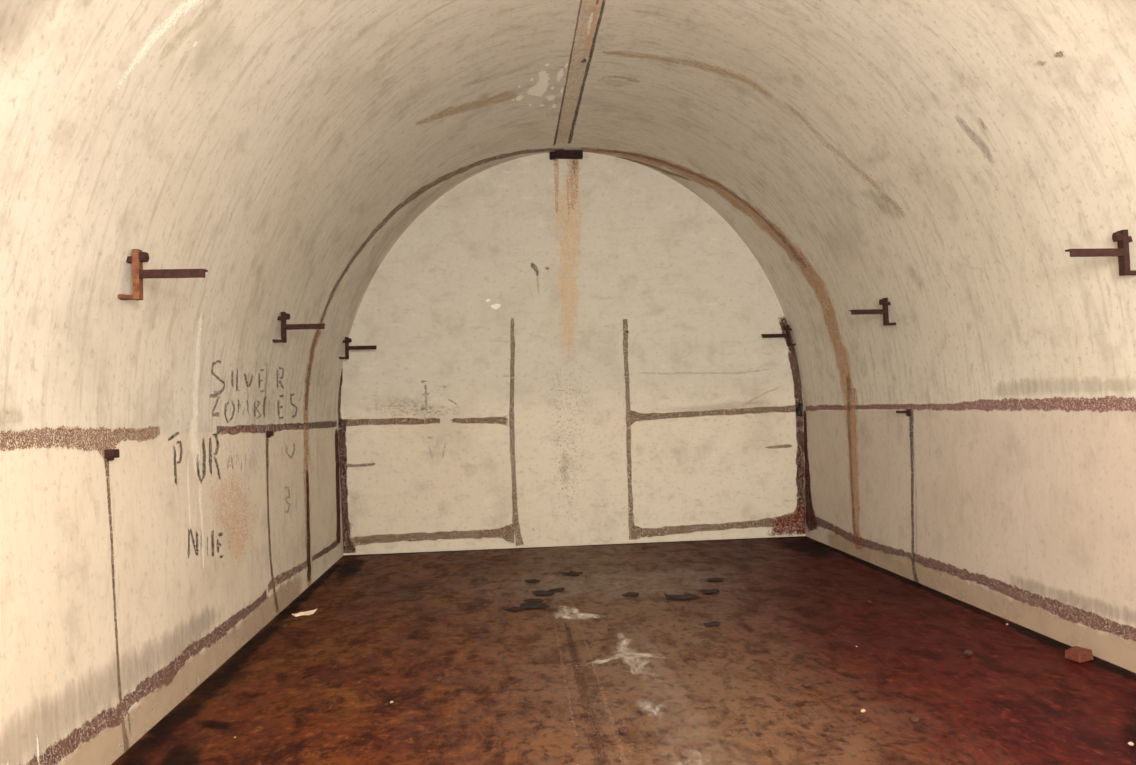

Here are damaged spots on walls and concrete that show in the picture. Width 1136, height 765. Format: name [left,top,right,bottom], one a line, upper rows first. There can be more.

spalling [512,63,568,108]
corrosion [302,0,861,586]